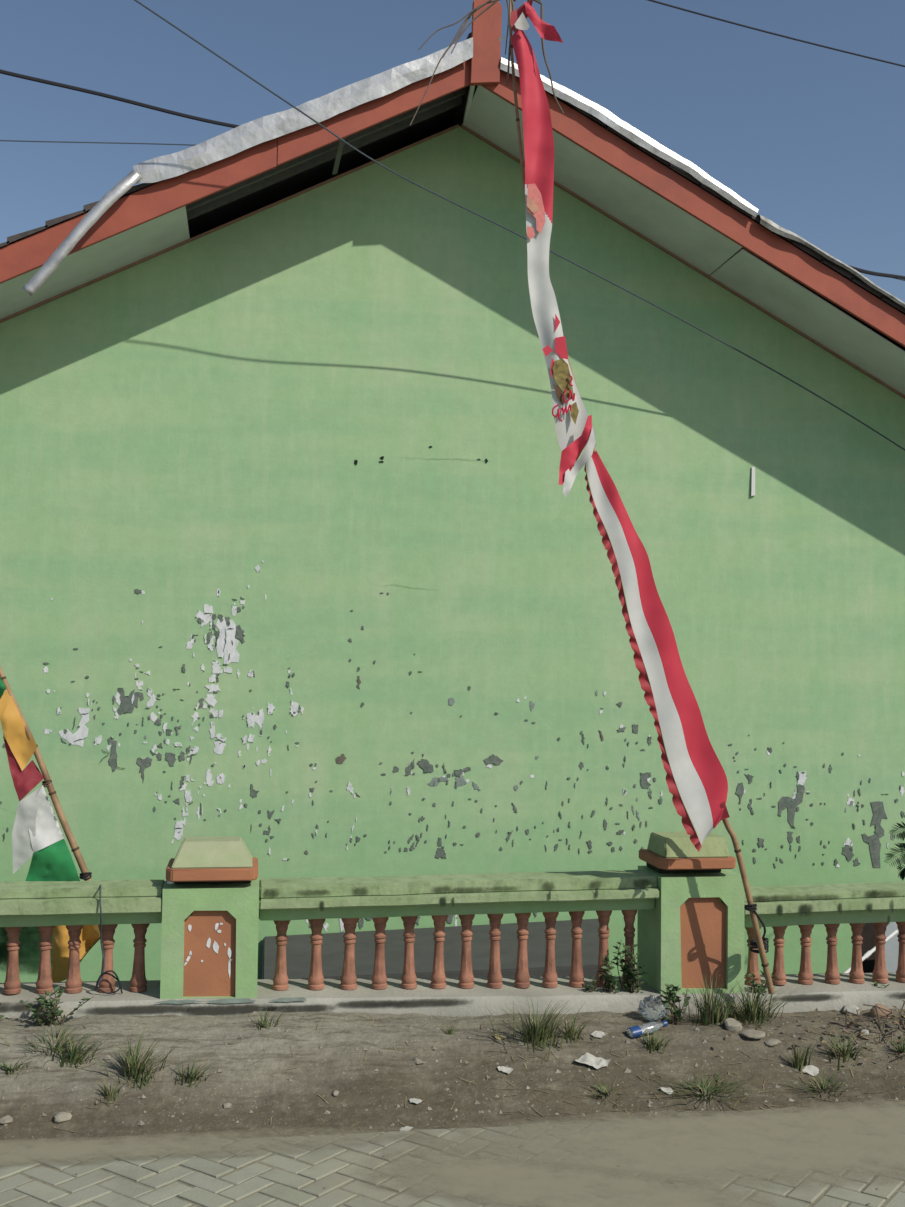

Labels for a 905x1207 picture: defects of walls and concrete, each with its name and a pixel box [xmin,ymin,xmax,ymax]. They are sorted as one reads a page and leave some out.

peeling [44,585,300,860]
peeling [286,656,304,717]
peeling [606,724,652,770]
peeling [380,752,663,858]
peeling [728,743,826,868]
peeling [813,772,905,868]
peeling [184,923,233,978]